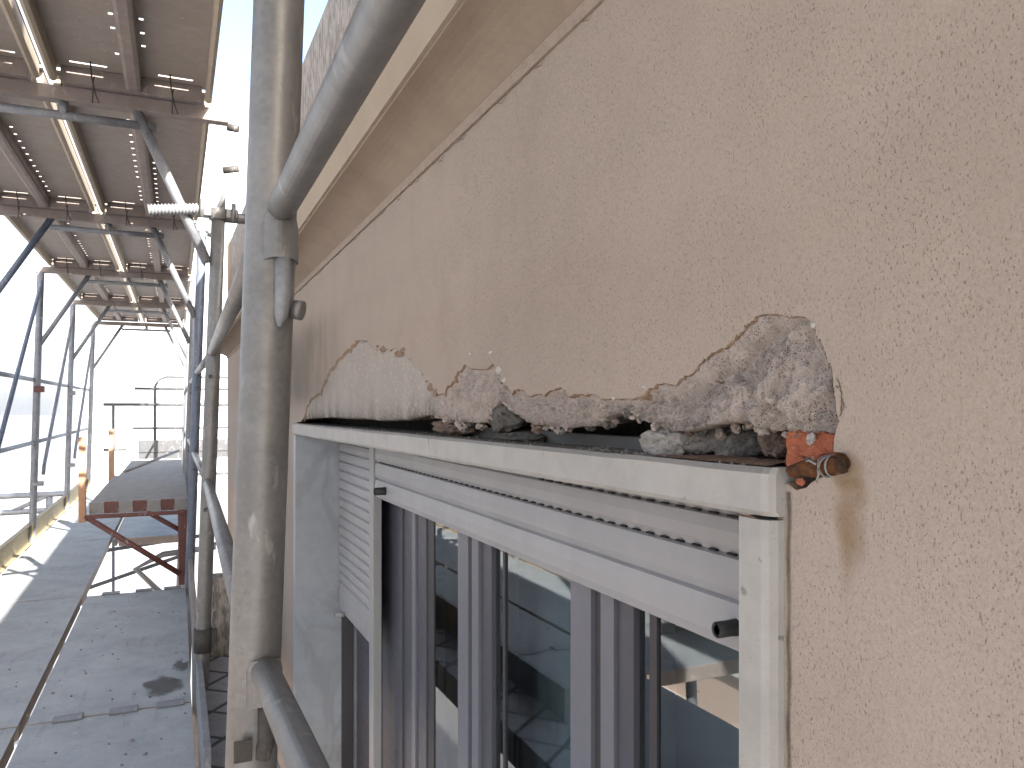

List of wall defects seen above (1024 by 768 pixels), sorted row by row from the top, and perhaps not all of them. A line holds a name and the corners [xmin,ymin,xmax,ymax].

spalling [303,313,851,490]
corrosion [786,454,851,483]